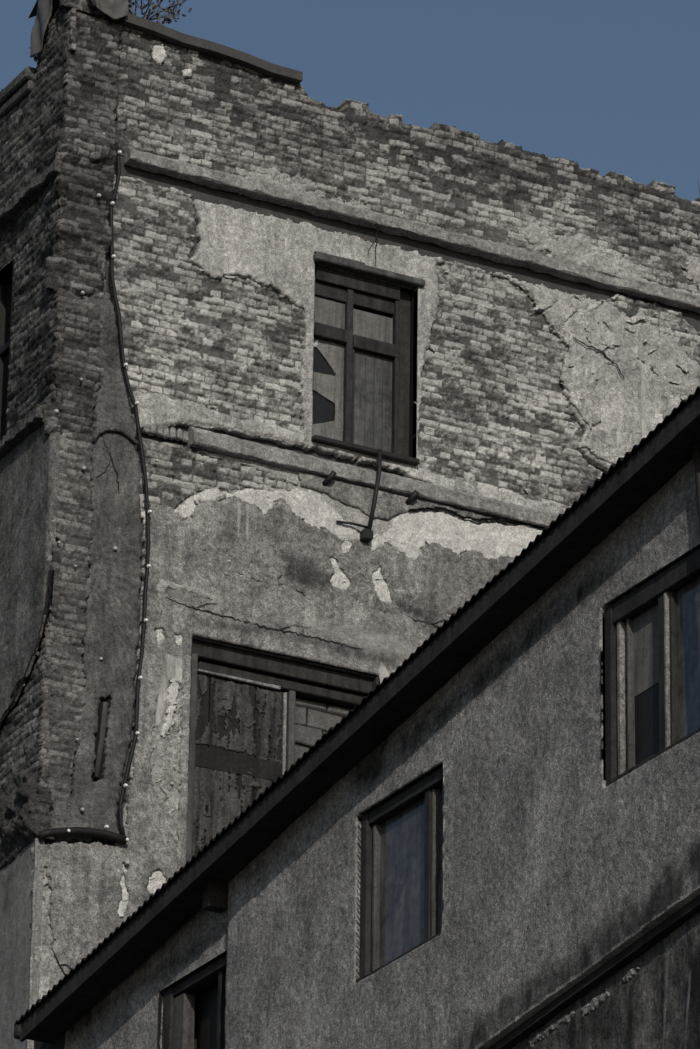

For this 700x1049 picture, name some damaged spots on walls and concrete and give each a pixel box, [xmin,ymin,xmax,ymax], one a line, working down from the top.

spalling [108,175,318,432]
spalling [413,261,700,508]
peeling [135,437,543,621]
crack [409,507,545,529]
peeling [155,628,183,645]
peeling [150,678,183,844]
peeling [192,674,283,856]
crack [51,948,72,975]
peeling [117,864,129,917]
peeling [140,861,167,894]
leakage [457,1023,486,1049]
leakage [501,843,700,1022]